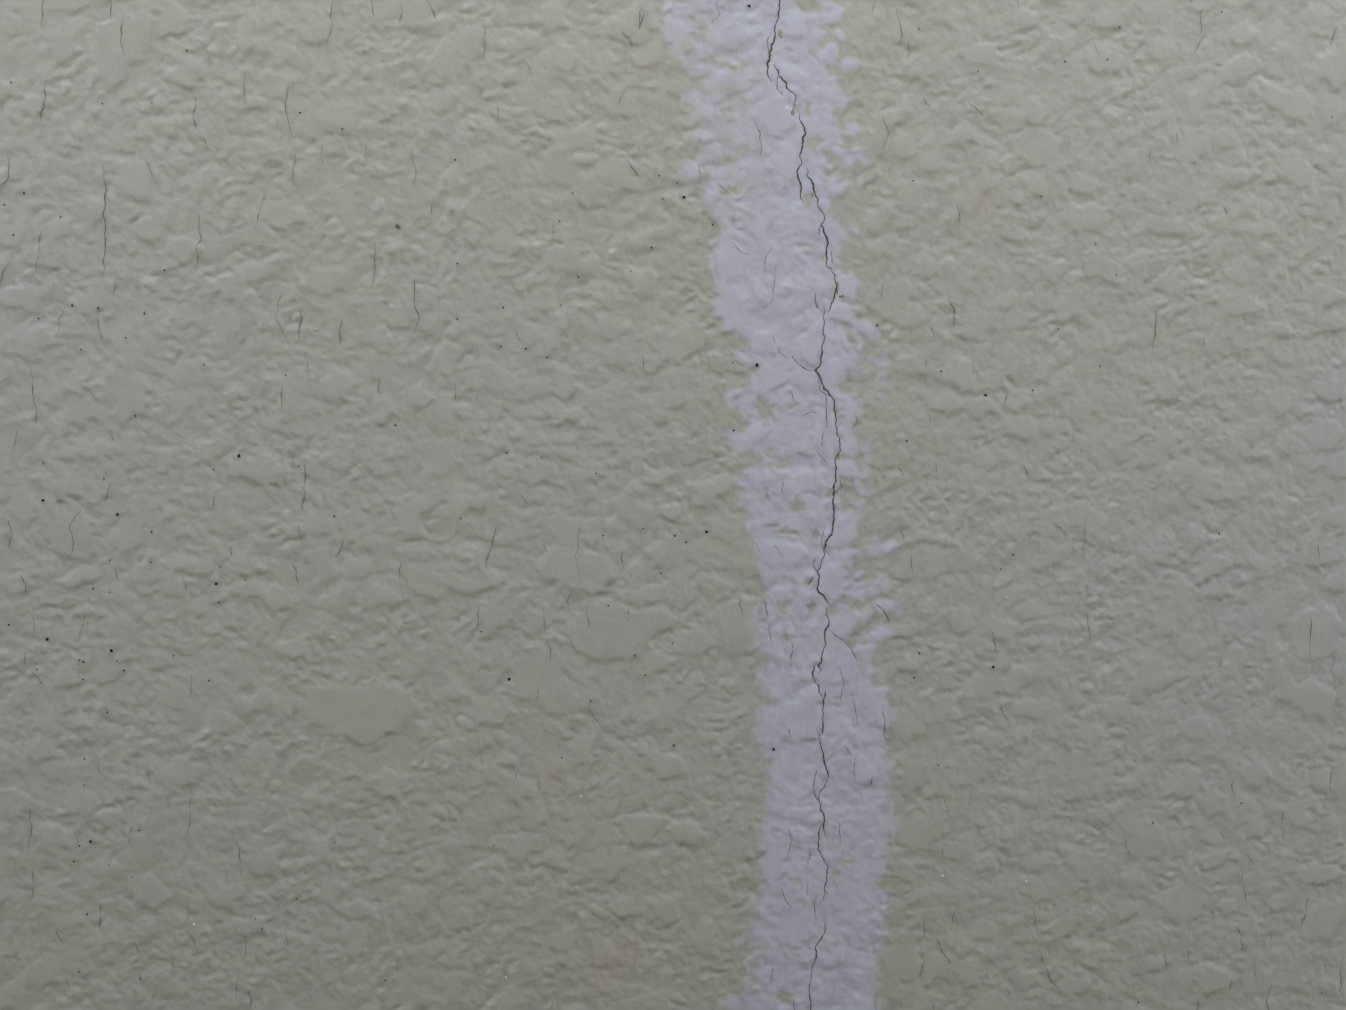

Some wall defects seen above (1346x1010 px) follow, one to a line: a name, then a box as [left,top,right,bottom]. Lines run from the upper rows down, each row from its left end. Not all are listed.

crack [698,0,892,1010]